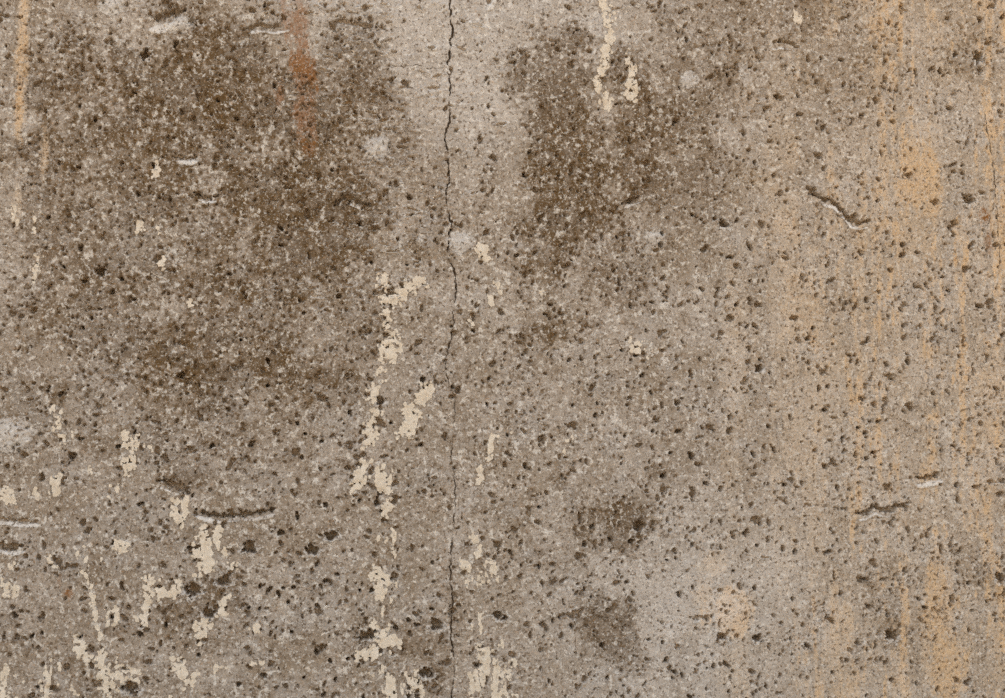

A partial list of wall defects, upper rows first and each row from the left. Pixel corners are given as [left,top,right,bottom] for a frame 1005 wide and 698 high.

rust [272,0,321,160]
leakage [0,0,424,512]
peeling [106,429,154,499]
peeling [349,272,435,559]
crack [392,0,457,698]
leakage [487,0,1005,698]
peeling [0,548,26,599]
peeling [38,658,80,698]
peeling [72,486,263,698]
peeling [352,563,440,698]
peeling [458,532,500,588]
peeling [467,610,519,698]